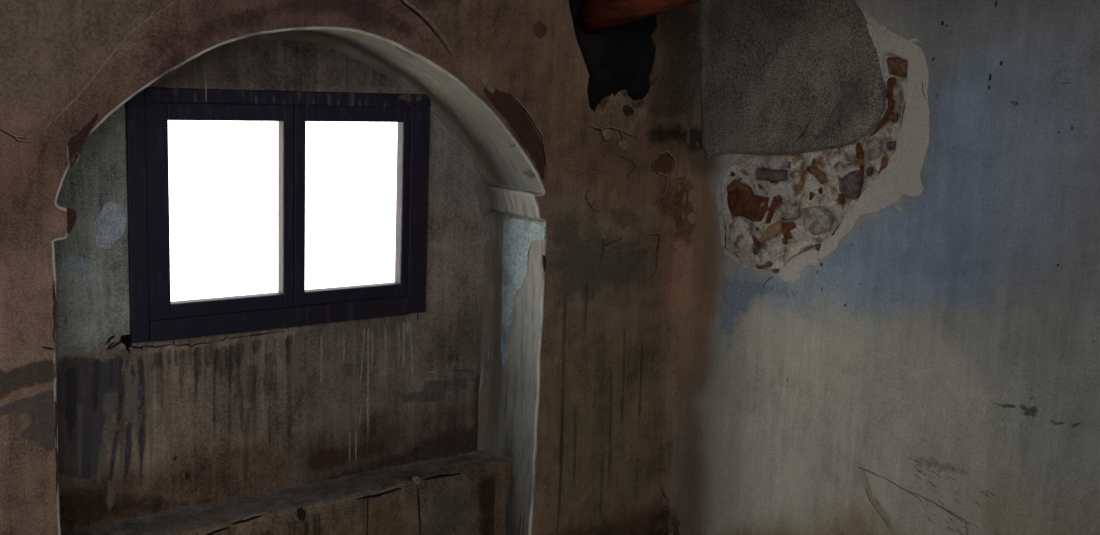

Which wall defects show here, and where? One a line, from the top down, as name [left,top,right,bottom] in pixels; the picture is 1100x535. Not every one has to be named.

flaking render [479,76,548,180]
spalling [569,0,662,116]
spalling [716,9,934,283]
water stain [320,322,422,478]